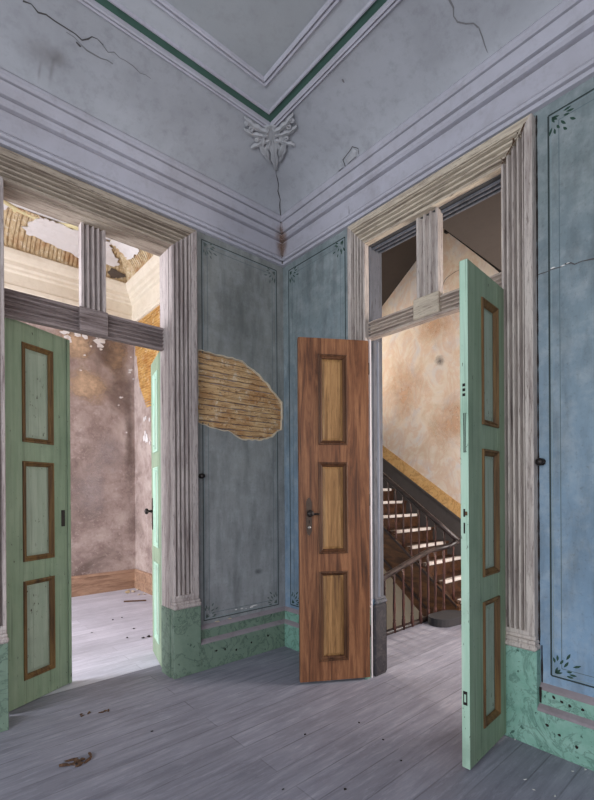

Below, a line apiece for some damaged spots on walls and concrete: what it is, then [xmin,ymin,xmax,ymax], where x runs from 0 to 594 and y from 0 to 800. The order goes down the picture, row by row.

crack [23,0,151,79]
crack [448,0,488,53]
peeling [22,216,79,258]
peeling [106,239,140,279]
crack [275,175,283,264]
flaking render [138,305,160,327]
peeling [60,330,159,422]
flaking render [198,350,283,441]